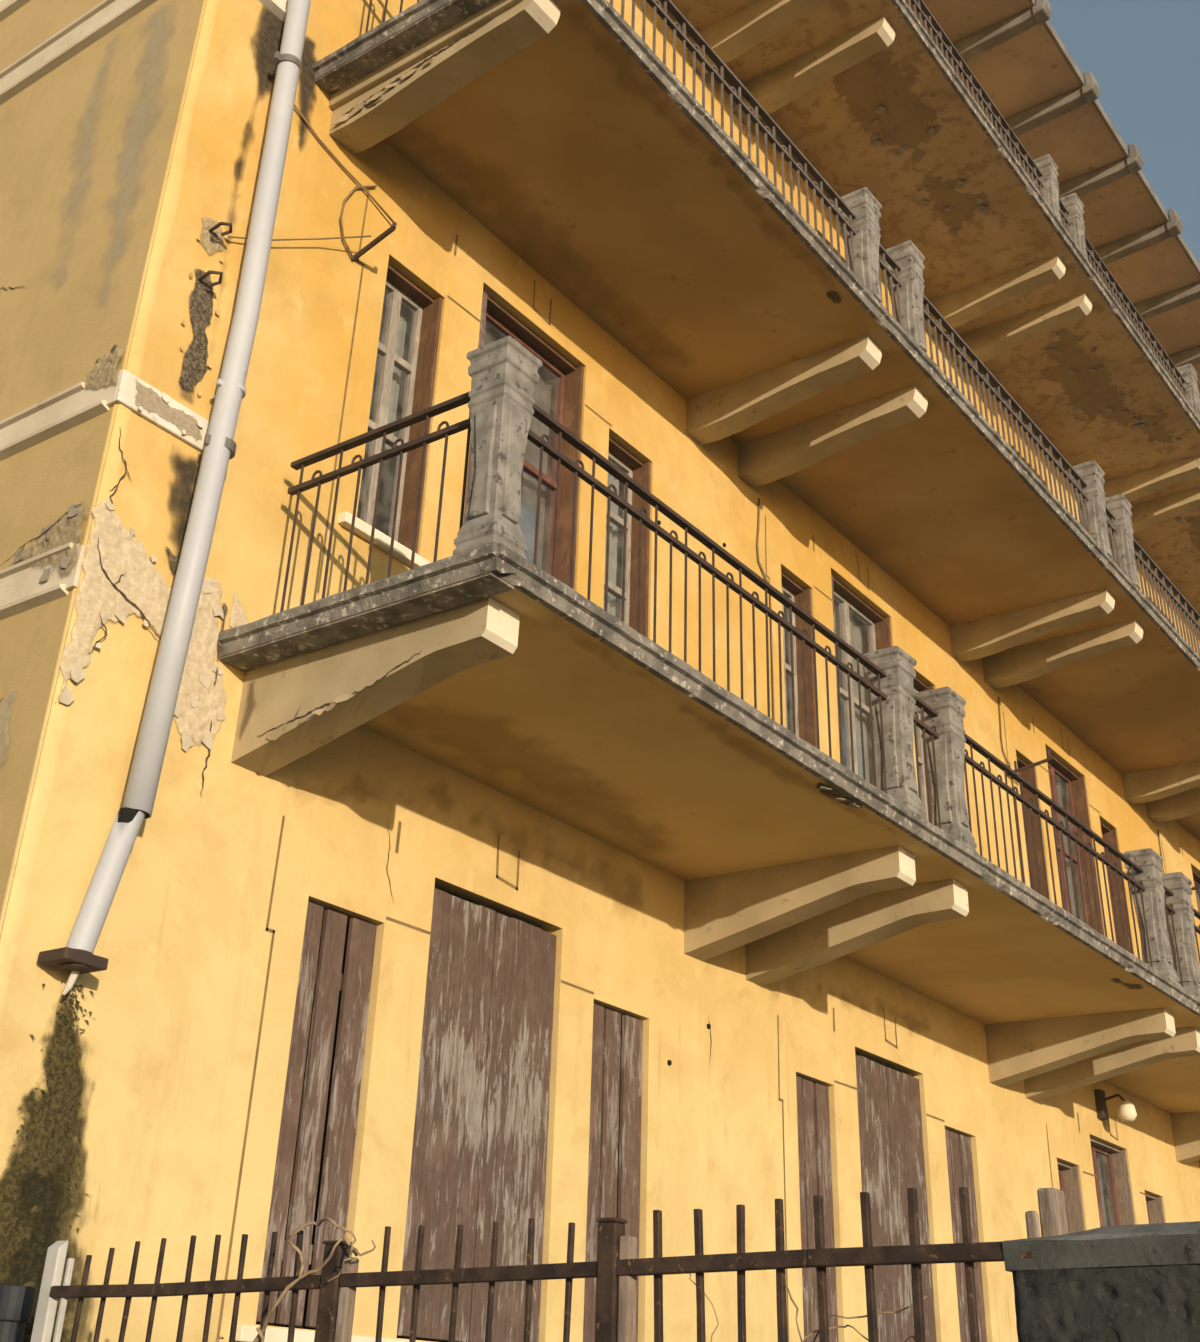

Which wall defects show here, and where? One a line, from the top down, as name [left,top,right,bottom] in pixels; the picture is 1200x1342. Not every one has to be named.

leakage [255,7,284,95]
leakage [300,38,316,147]
leakage [235,123,252,180]
spalling [197,218,232,262]
spalling [85,345,124,389]
spalling [135,269,221,441]
spalling [2,500,179,705]
spalling [174,577,228,796]